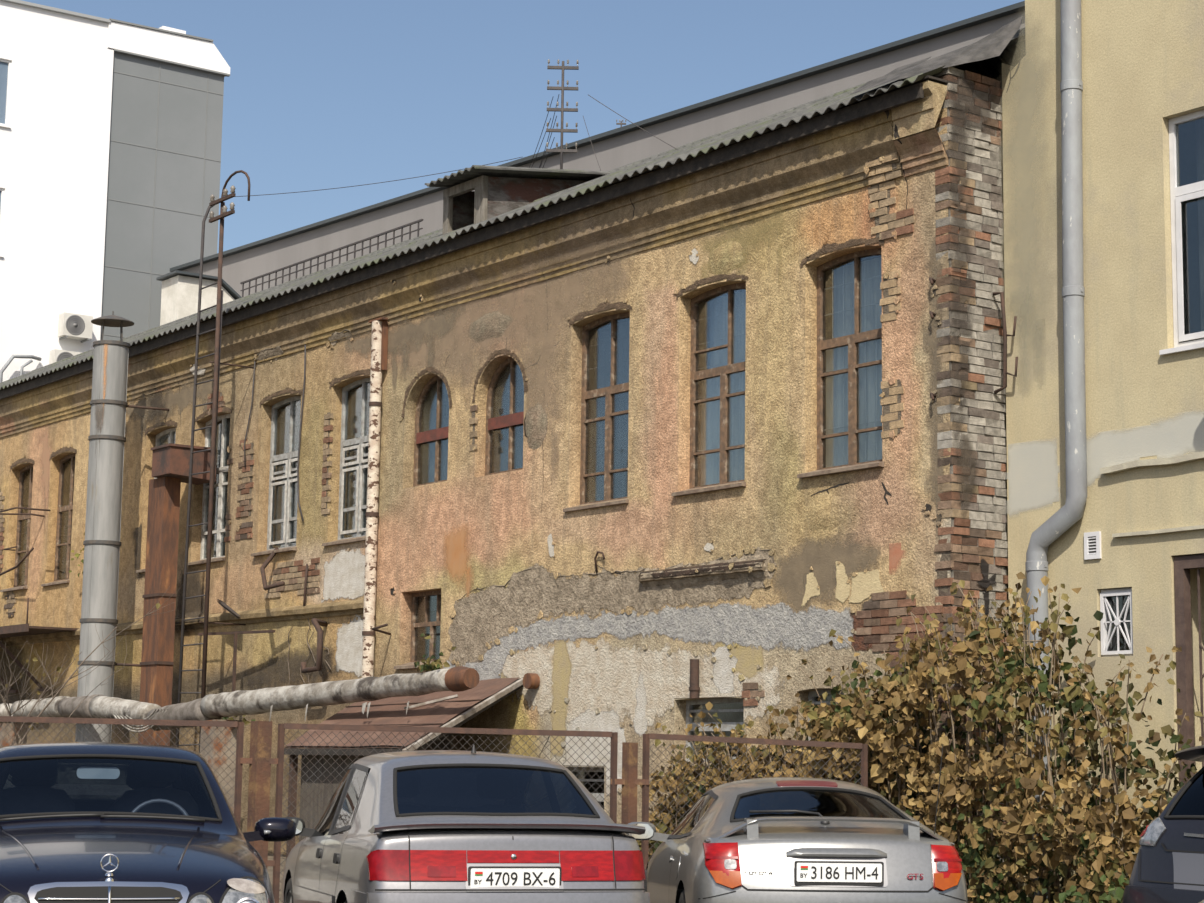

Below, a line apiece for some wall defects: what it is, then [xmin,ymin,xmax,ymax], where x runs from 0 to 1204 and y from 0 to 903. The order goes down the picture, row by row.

flaking render [864,152,915,240]
flaking render [880,270,901,323]
flaking render [879,378,904,439]
flaking render [224,439,255,542]
flaking render [4,591,16,618]
peeling [264,548,365,602]
peeling [335,615,363,677]
flaking render [443,534,954,795]